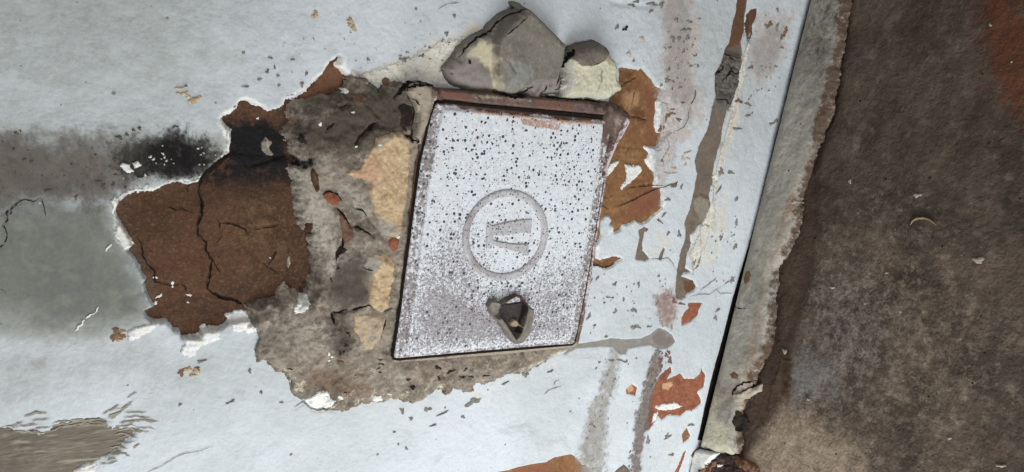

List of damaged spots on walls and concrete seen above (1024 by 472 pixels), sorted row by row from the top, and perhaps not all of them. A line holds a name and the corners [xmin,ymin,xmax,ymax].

crack [137,154,286,304]
spalling [42,32,466,377]
spalling [586,0,788,334]
flaking render [0,392,160,472]
flaking render [305,390,347,408]
spalling [499,454,593,472]
spalling [595,349,705,472]